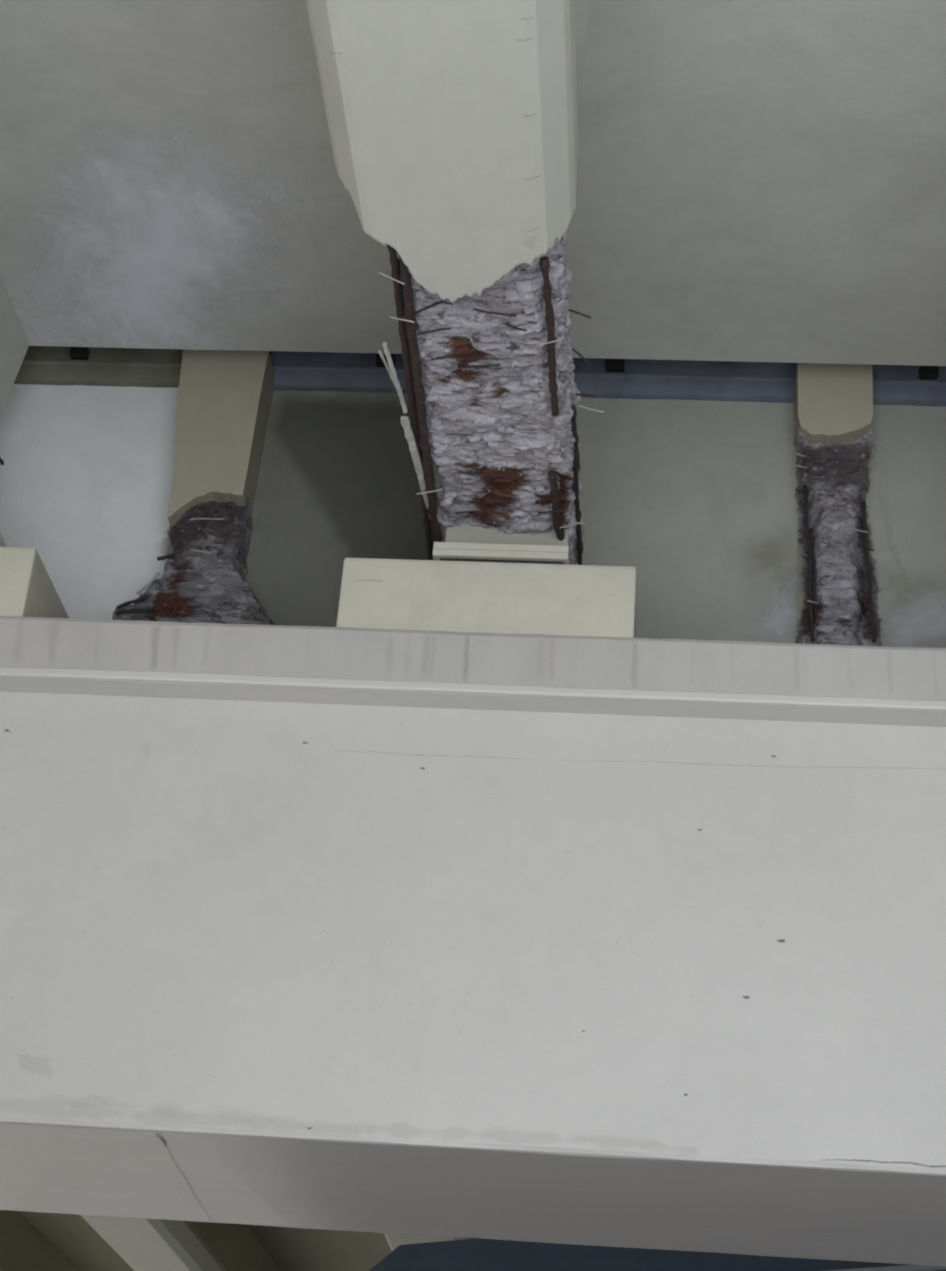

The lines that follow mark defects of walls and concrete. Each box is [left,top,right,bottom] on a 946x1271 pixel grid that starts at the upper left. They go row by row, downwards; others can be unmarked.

spalling [378,229,604,565]
spalling [112,491,274,625]
spalling [795,421,882,647]
crack [826,1159,946,1168]